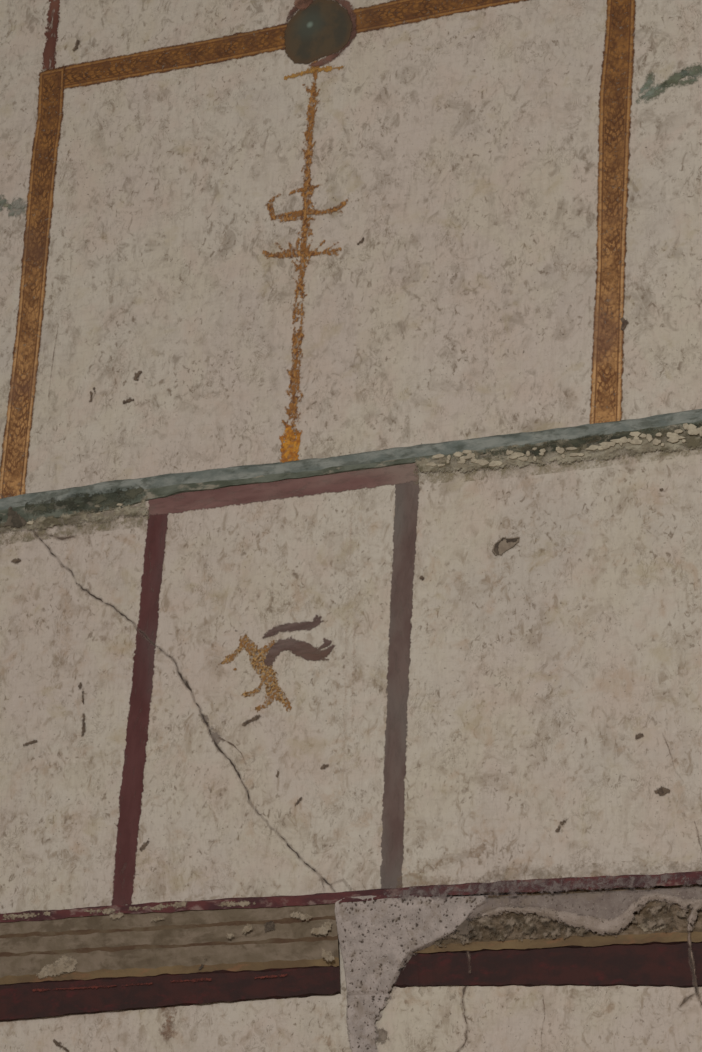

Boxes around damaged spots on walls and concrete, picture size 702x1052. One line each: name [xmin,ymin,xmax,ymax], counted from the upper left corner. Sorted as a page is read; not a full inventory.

peeling [415,423,702,476]
crack [0,494,333,889]
crack [457,920,472,957]
crack [680,908,702,1006]
flaking render [375,1028,389,1043]
crack [457,986,467,1052]